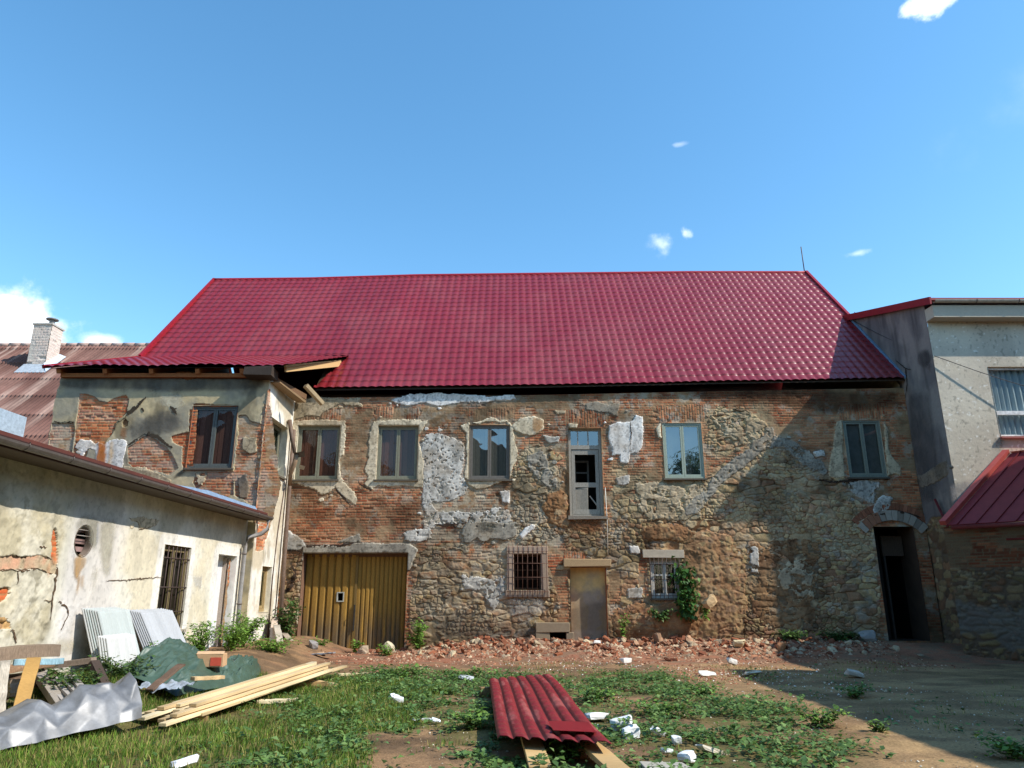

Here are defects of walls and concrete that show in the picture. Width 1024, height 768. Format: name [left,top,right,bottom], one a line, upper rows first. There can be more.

peeling [47,389,578,571]
peeling [582,402,707,522]
peeling [813,415,901,514]
flaking render [0,617,10,629]
flaking render [0,529,57,574]
peeling [461,572,507,610]
peeling [627,587,643,599]
peeling [741,538,824,633]